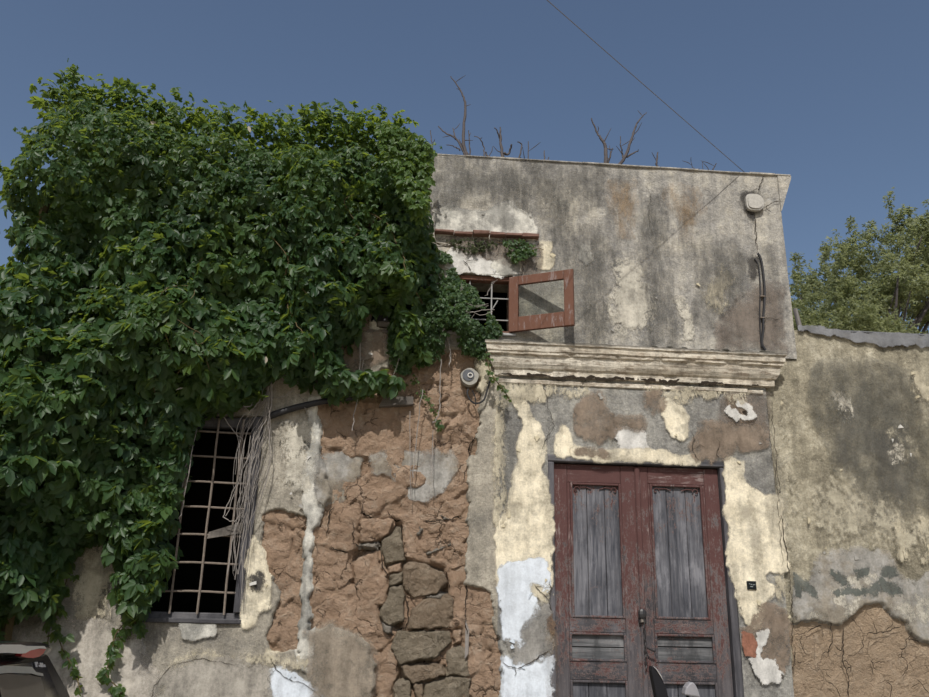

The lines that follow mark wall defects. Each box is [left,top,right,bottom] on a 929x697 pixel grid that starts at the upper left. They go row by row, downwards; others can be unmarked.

peeling [434,201,556,279]
leakage [740,190,760,220]
crack [746,176,779,253]
leakage [810,363,929,505]
spalling [167,314,929,697]
crack [498,373,929,697]